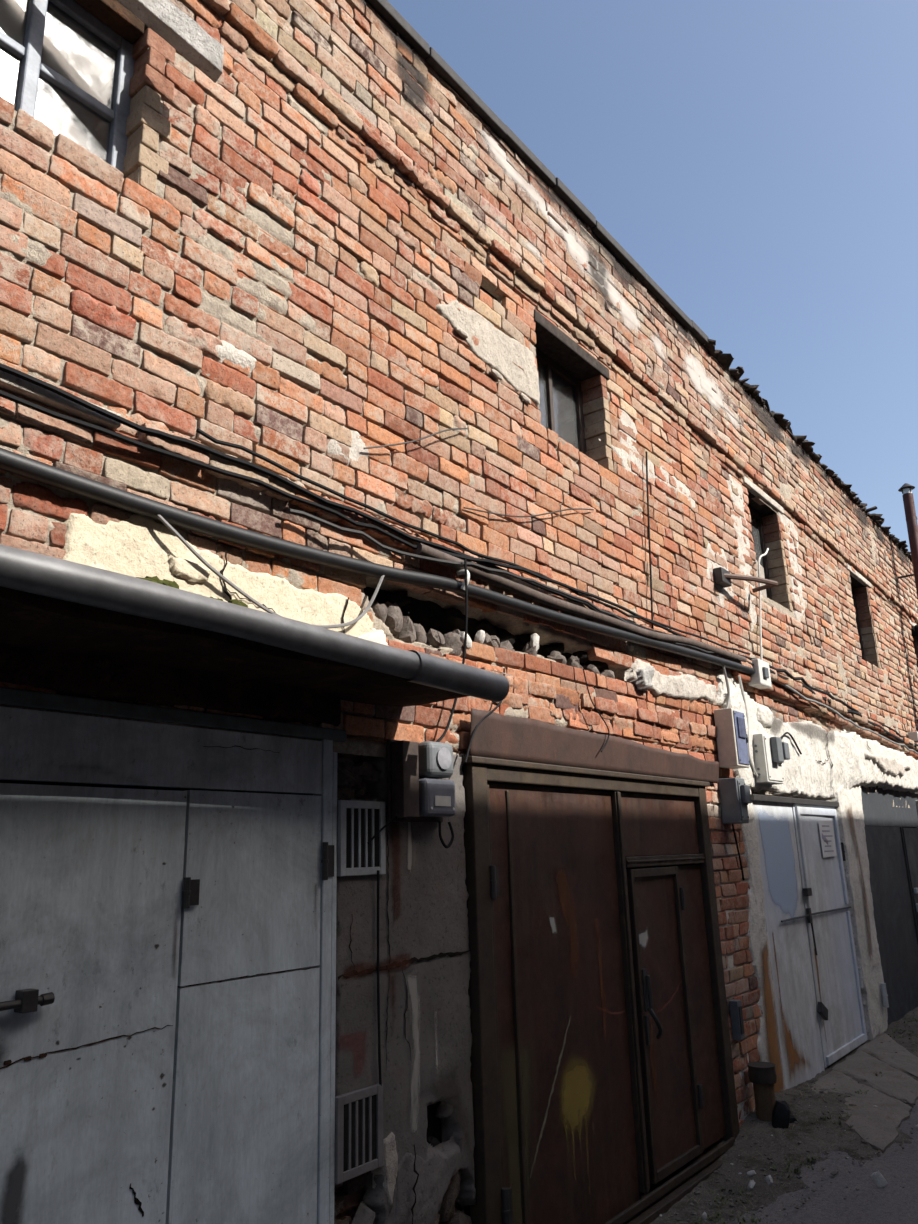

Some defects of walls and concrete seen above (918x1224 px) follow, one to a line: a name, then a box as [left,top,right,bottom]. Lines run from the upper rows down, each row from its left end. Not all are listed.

peeling [61,513,741,705]
crack [0,1025,173,1069]
crack [181,806,470,1067]
rust [762,933,805,1093]